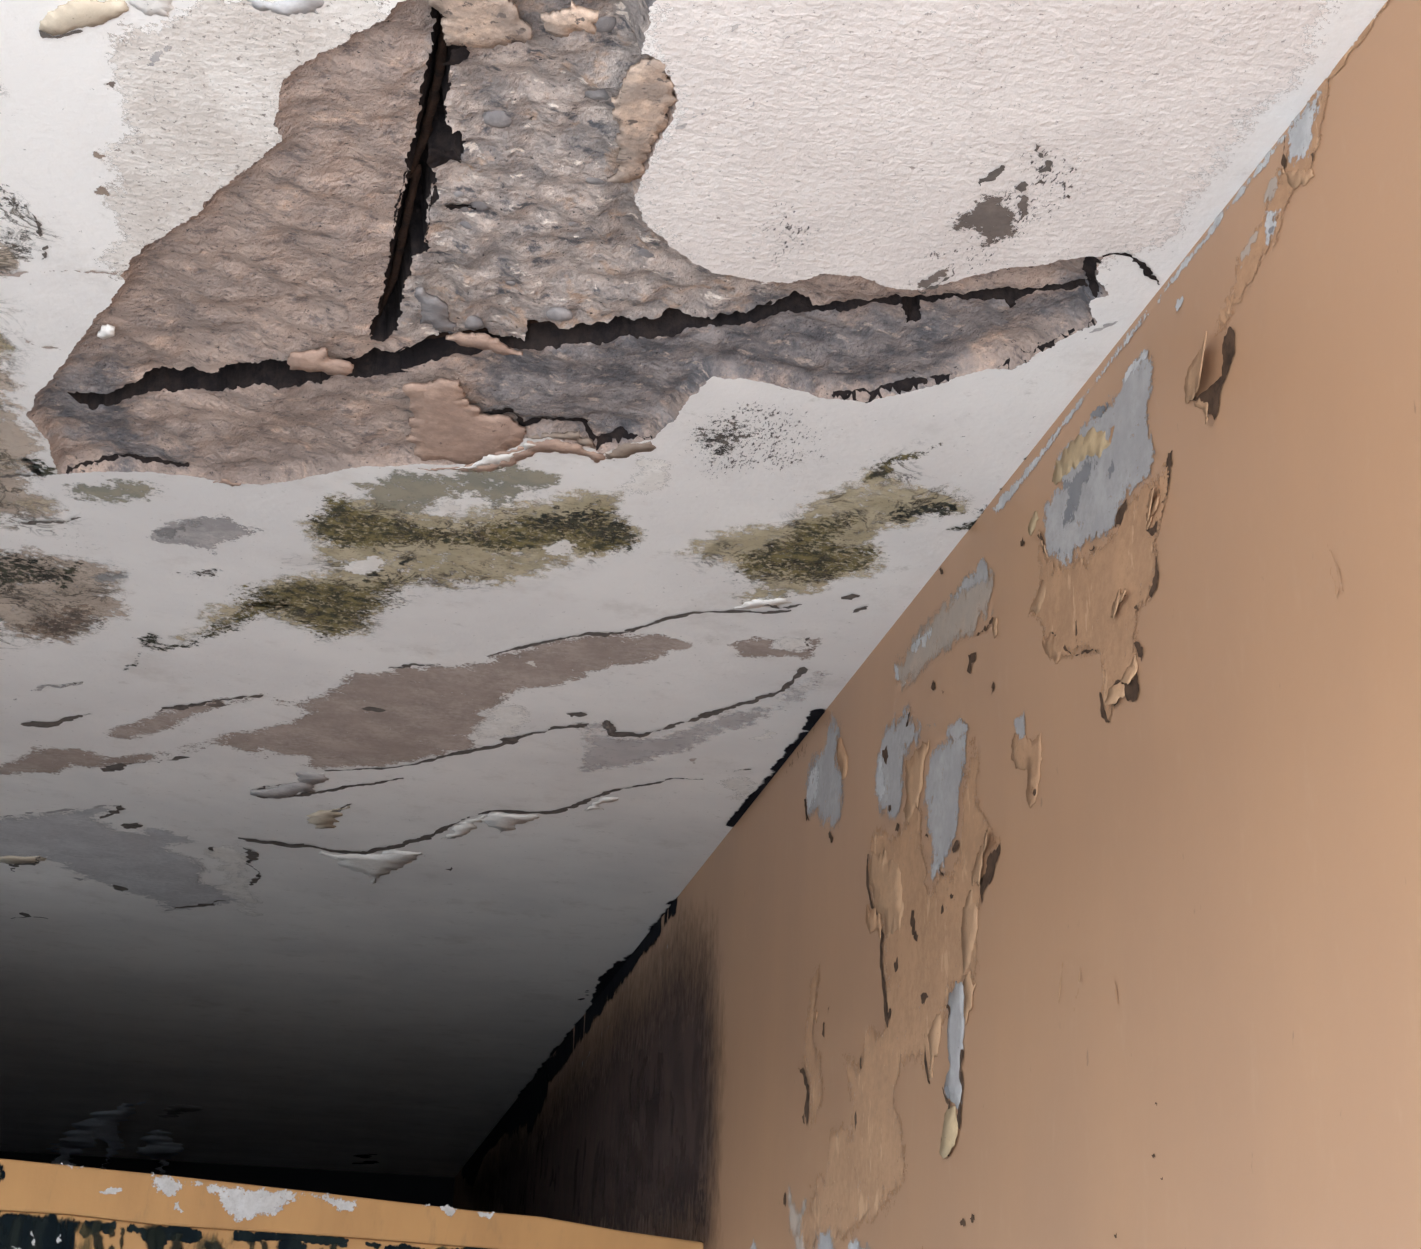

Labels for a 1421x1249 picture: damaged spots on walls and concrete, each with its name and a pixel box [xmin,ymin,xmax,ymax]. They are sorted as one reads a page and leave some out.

crack [67,7,1160,410]
spalling [26,0,1389,487]
peeling [0,626,709,775]
water stain [124,455,672,670]
crack [238,667,816,884]
crack [483,408,652,451]
crack [624,598,802,632]
water stain [726,709,825,827]
peeling [1020,349,1172,724]
peeling [783,558,1001,1249]
water stain [462,898,715,1249]
water stain [0,1211,488,1249]